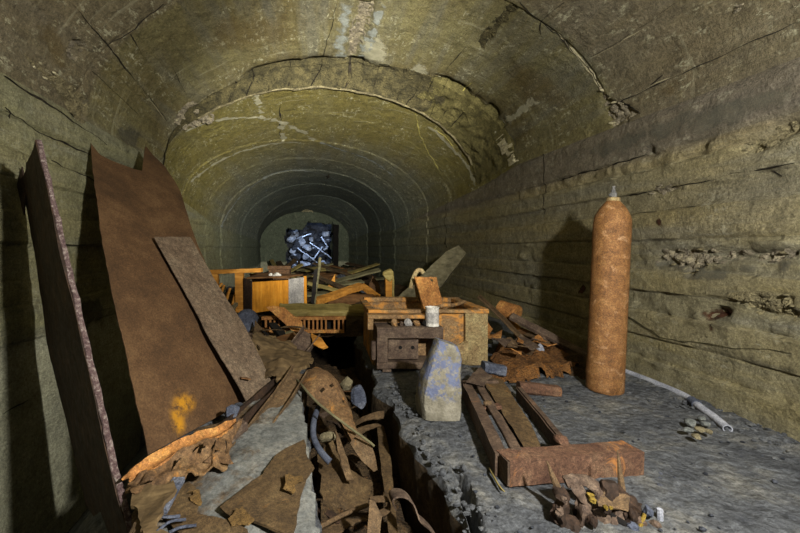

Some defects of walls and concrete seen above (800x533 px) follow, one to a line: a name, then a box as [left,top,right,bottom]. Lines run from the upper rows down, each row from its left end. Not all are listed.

crack [4,76,107,155]
crack [79,4,167,121]
spalling [163,0,519,185]
water stain [334,6,351,57]
water stain [359,11,386,61]
crack [520,2,675,89]
spalling [599,86,637,127]
crack [620,23,794,114]
spalling [656,247,800,275]
crack [628,317,786,353]
corrosion [702,308,732,330]
spalling [739,293,799,321]